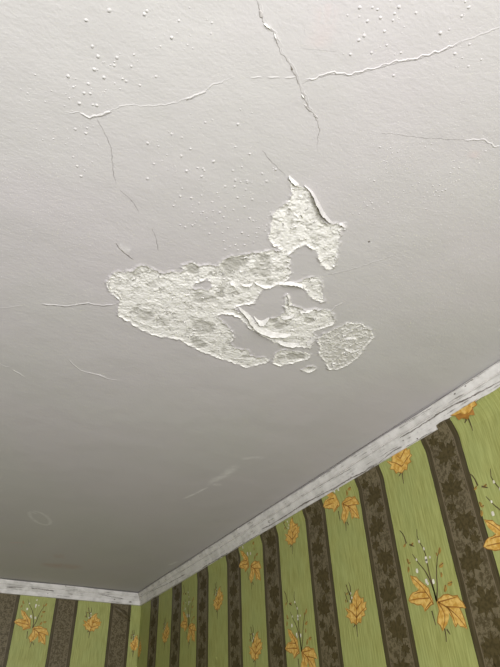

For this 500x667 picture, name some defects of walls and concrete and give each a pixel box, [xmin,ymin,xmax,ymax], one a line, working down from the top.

crack [64,0,500,212]
crack [43,300,117,308]
peeling [106,176,373,373]